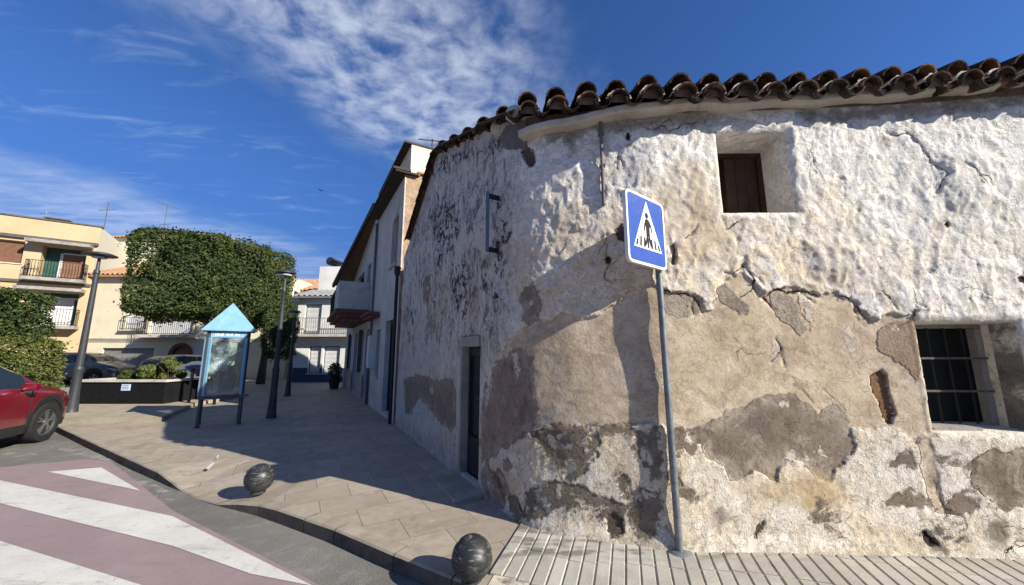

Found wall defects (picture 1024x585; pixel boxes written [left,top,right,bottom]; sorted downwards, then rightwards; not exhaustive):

spalling [521,146,536,167]
crack [887,130,991,191]
leakage [429,197,512,324]
peeling [404,374,457,432]
peeling [479,264,1024,546]